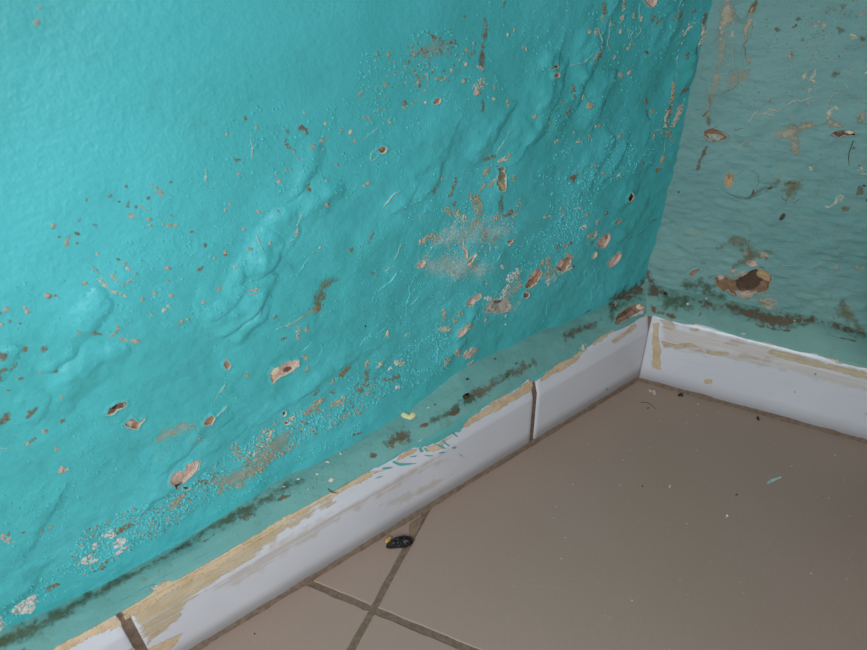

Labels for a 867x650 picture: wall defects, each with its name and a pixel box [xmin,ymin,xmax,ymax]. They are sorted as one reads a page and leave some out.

flaking render [463,255,573,325]
flaking render [713,251,774,300]
flaking render [613,302,647,327]
flaking render [266,357,302,386]
leakage [455,347,479,366]
flaking render [103,398,148,433]
flaking render [200,412,218,428]
flaking render [166,458,202,492]
leakage [215,434,290,487]
leakage [362,433,464,479]
leakage [80,529,128,564]
leakage [11,595,37,615]